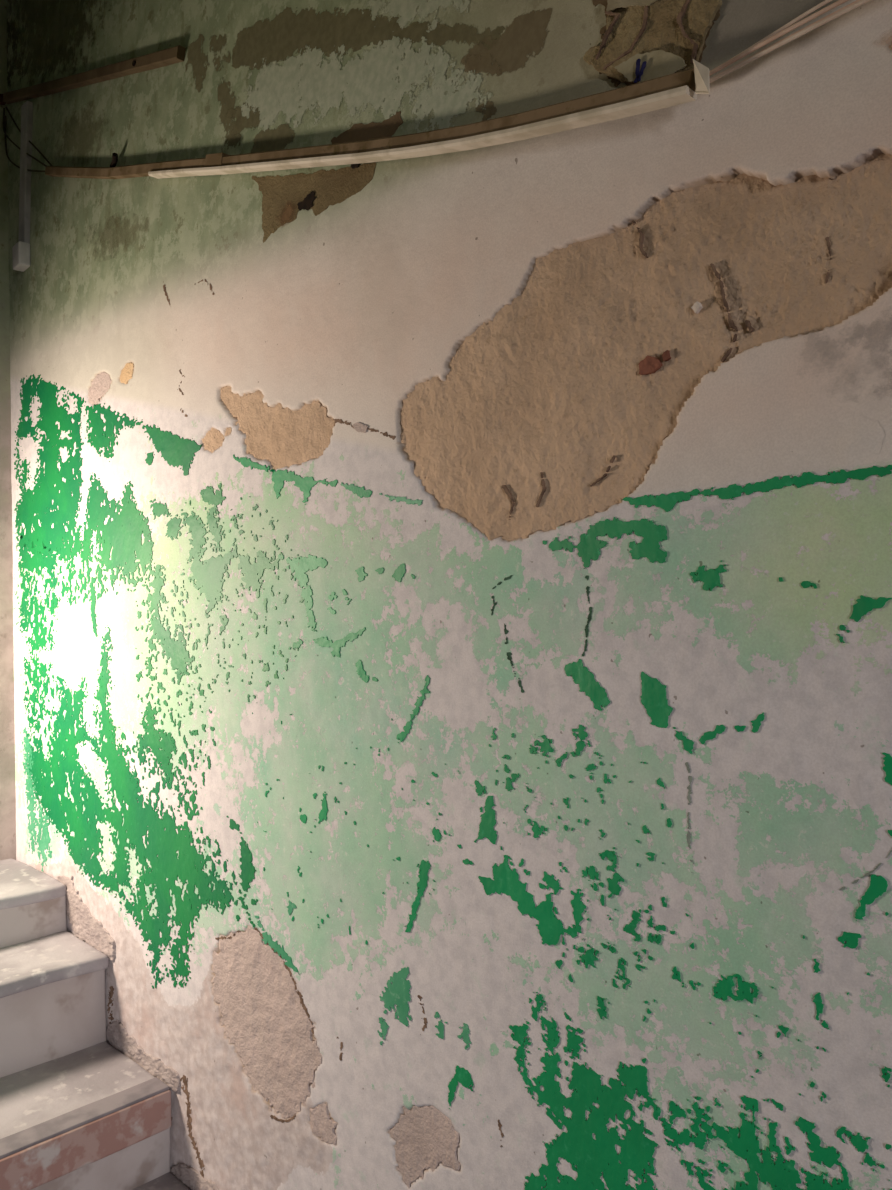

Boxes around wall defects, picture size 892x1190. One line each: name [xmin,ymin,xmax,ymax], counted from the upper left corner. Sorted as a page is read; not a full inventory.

leakage [7,0,110,86]
leakage [185,0,553,153]
peeling [252,162,376,243]
spalling [400,153,892,569]
peeling [14,362,430,1145]
peeling [564,659,610,711]
peeling [640,671,765,754]
peeling [404,860,435,932]
peeling [413,724,675,1019]
peeling [838,874,888,949]
flaking render [389,1065,474,1188]
peeling [509,992,892,1190]